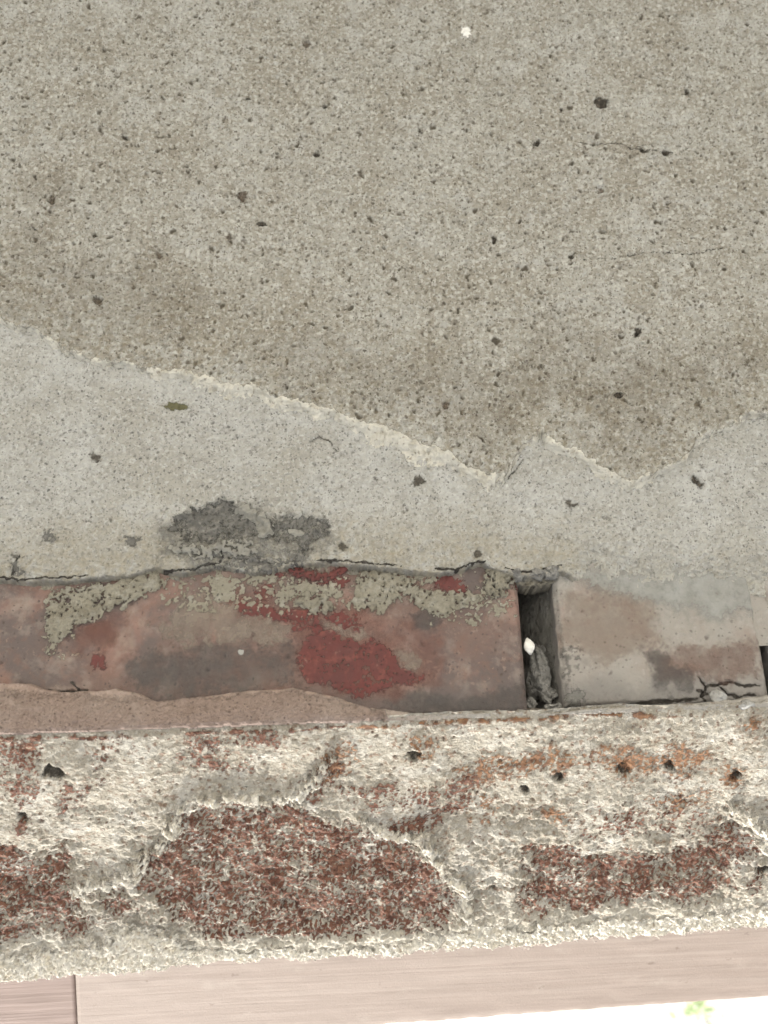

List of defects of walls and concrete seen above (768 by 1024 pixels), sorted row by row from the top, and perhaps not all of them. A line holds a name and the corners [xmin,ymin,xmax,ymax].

spalling [0,315,768,493]
spalling [11,554,26,577]
crack [0,555,86,582]
crack [164,551,242,576]
crack [316,558,402,567]
crack [435,560,562,574]
spalling [41,498,517,699]
peeling [523,638,535,655]
crack [630,676,760,705]
peeling [0,755,468,944]
peeling [515,794,768,922]